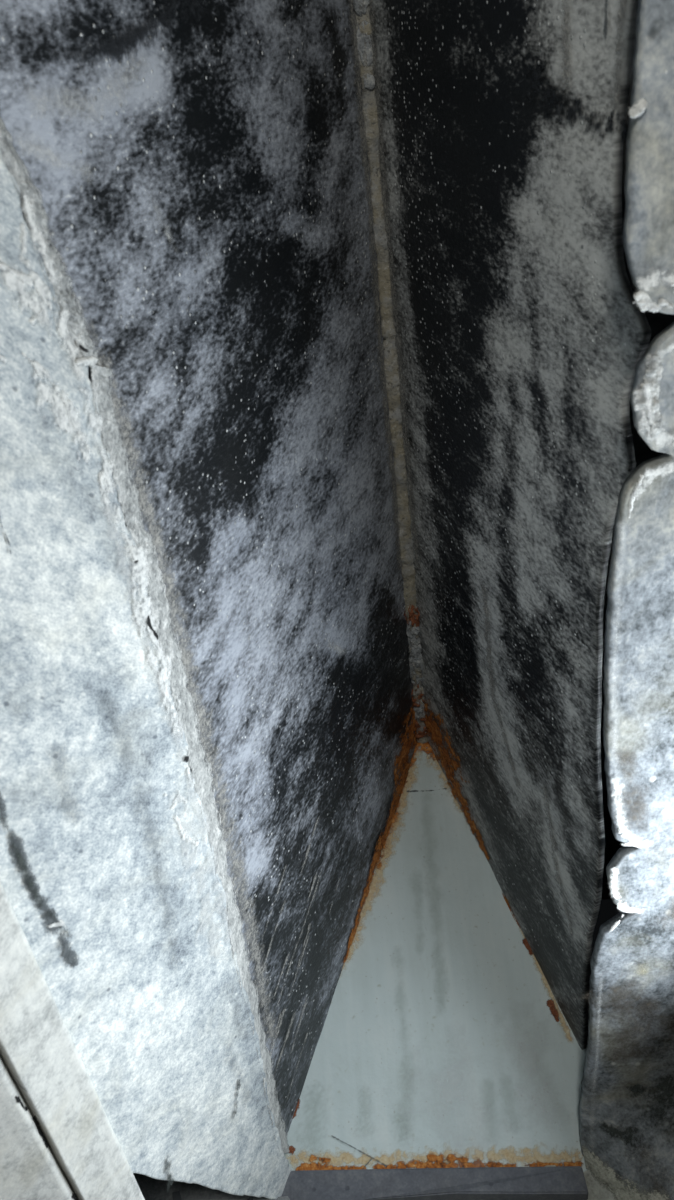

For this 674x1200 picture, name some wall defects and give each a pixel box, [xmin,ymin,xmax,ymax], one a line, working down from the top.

corrosion [342,684,489,969]
corrosion [502,893,572,1041]
corrosion [288,1146,583,1171]
leakage [599,1122,664,1194]